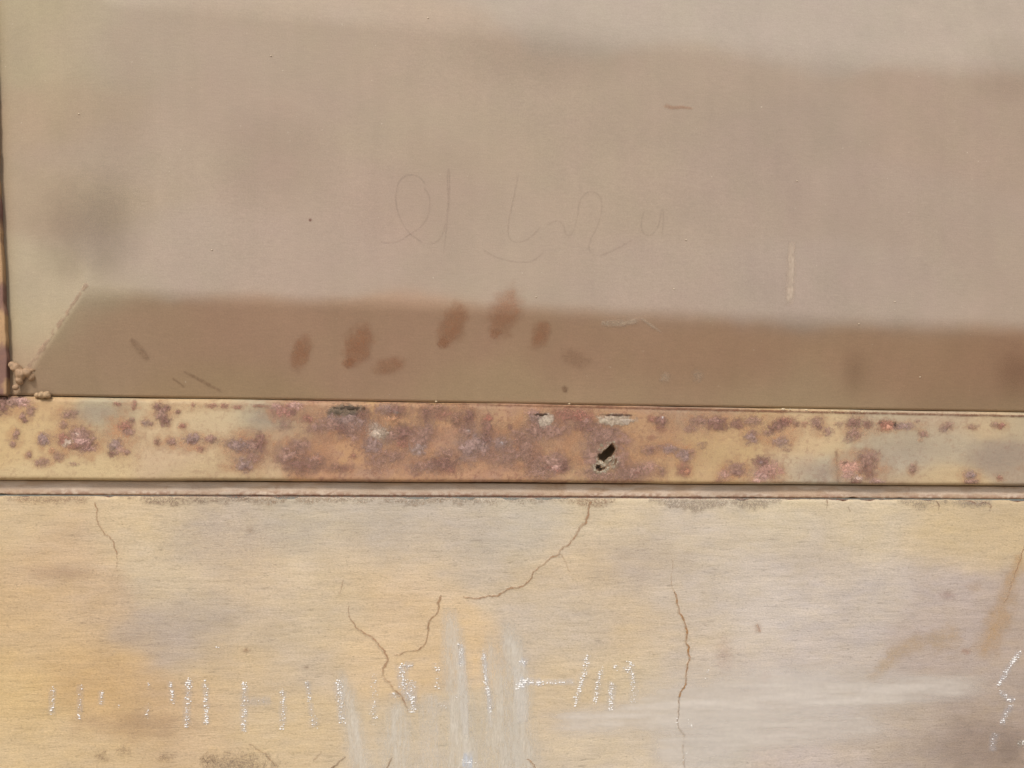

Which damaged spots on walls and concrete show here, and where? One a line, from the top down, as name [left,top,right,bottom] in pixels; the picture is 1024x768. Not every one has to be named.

corrosion [0,397,35,447]
corrosion [27,401,404,476]
corrosion [526,405,1024,483]
crack [466,501,592,599]
crack [351,597,441,667]
water stain [446,620,532,768]
crack [674,592,690,745]